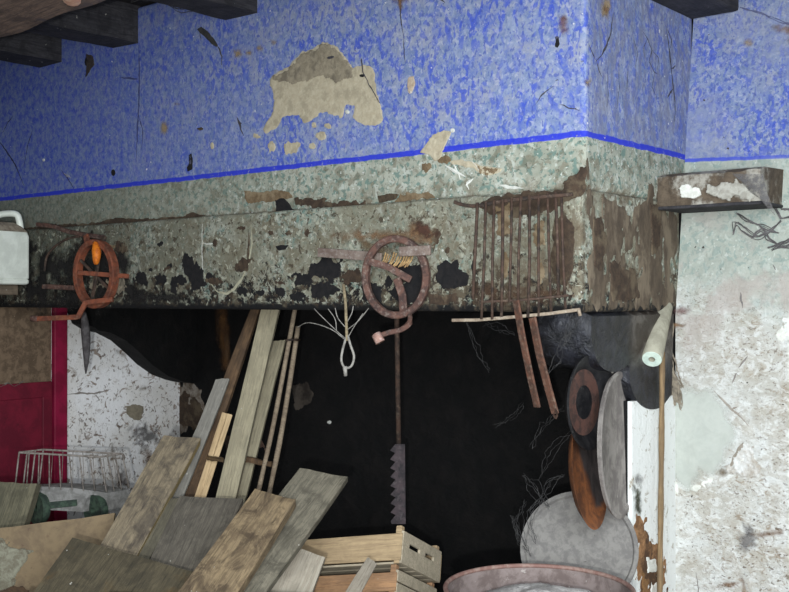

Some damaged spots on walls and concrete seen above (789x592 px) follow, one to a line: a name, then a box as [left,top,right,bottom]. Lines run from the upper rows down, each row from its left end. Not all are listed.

spalling [253,42,383,155]
spalling [420,128,502,189]
peeling [88,273,127,298]
peeling [135,252,223,296]
peeling [235,257,251,272]
peeling [236,286,265,297]
spalling [634,514,668,592]